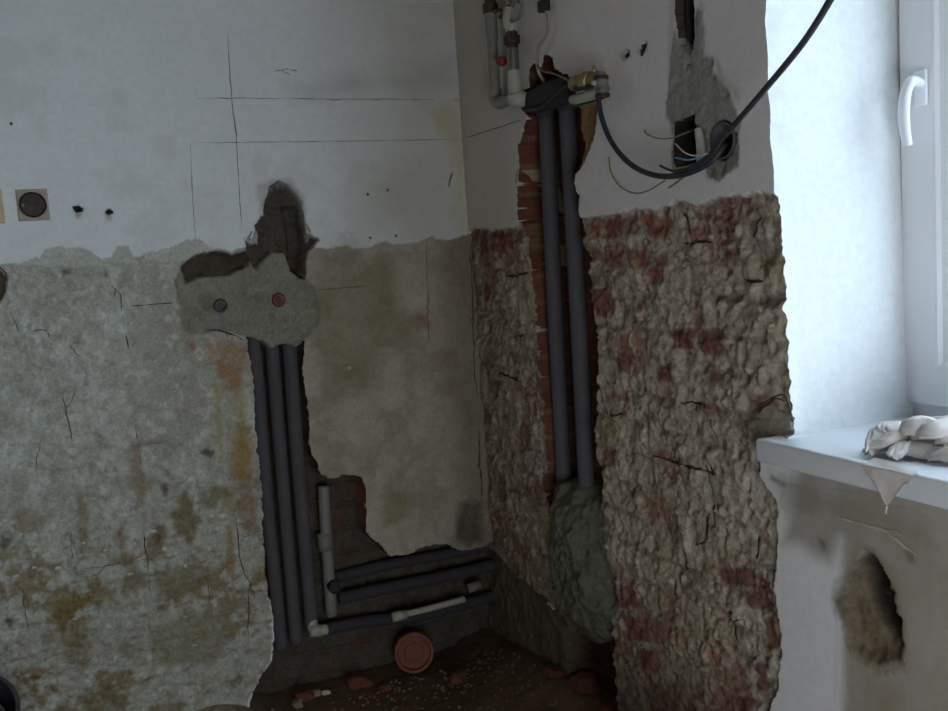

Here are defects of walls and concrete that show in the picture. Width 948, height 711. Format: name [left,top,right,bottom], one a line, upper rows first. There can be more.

spalling [674,114,697,168]
crack [62,393,75,441]
spalling [0,230,273,711]
rust [187,333,263,586]
crack [234,507,255,637]
spalling [302,223,555,608]
crack [652,455,716,596]
spalling [580,190,795,711]
crack [680,401,718,438]
spalling [835,550,905,648]